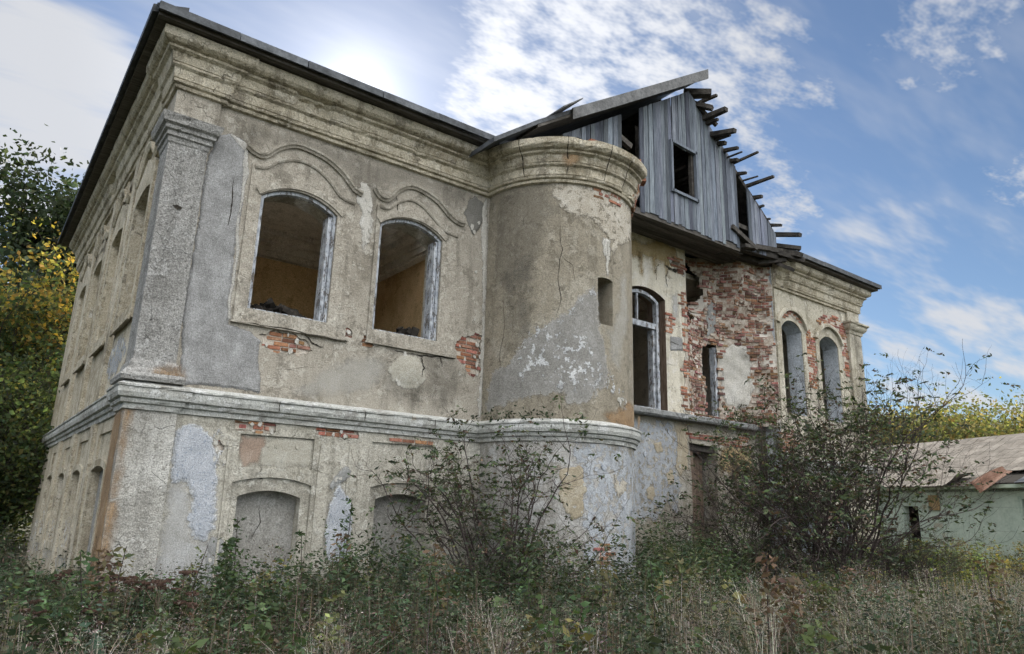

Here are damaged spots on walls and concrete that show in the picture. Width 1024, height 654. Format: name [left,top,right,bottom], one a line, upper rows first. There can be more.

peeling [356,182,374,249]
spalling [464,197,483,235]
crack [557,238,575,312]
flaking render [551,183,640,276]
spalling [259,330,311,357]
flaking render [455,286,627,412]
flaking render [558,256,851,579]
flaking render [171,420,276,579]
flaking render [324,466,353,565]